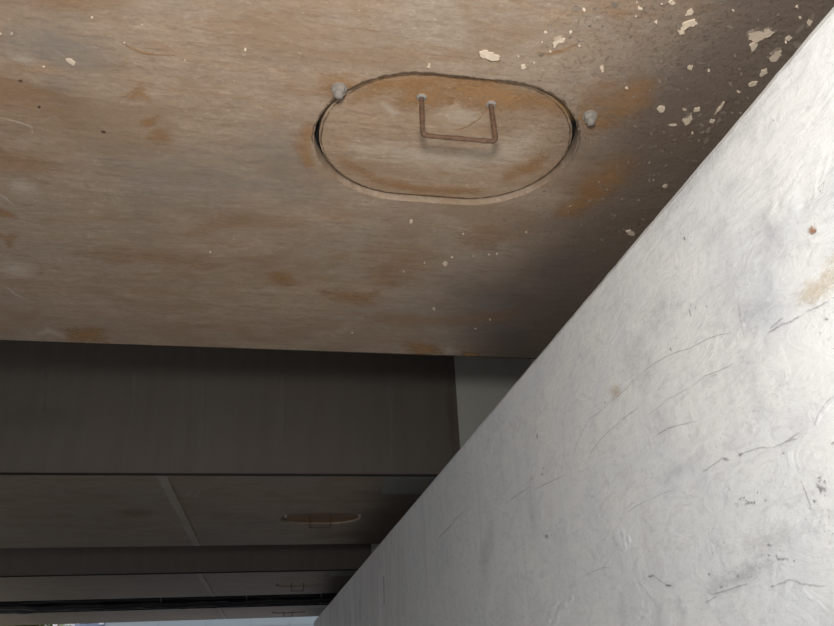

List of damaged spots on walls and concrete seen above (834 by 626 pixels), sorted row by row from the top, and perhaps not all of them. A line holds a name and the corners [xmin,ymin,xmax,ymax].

peeling [661,0,709,51]
peeling [746,5,826,87]